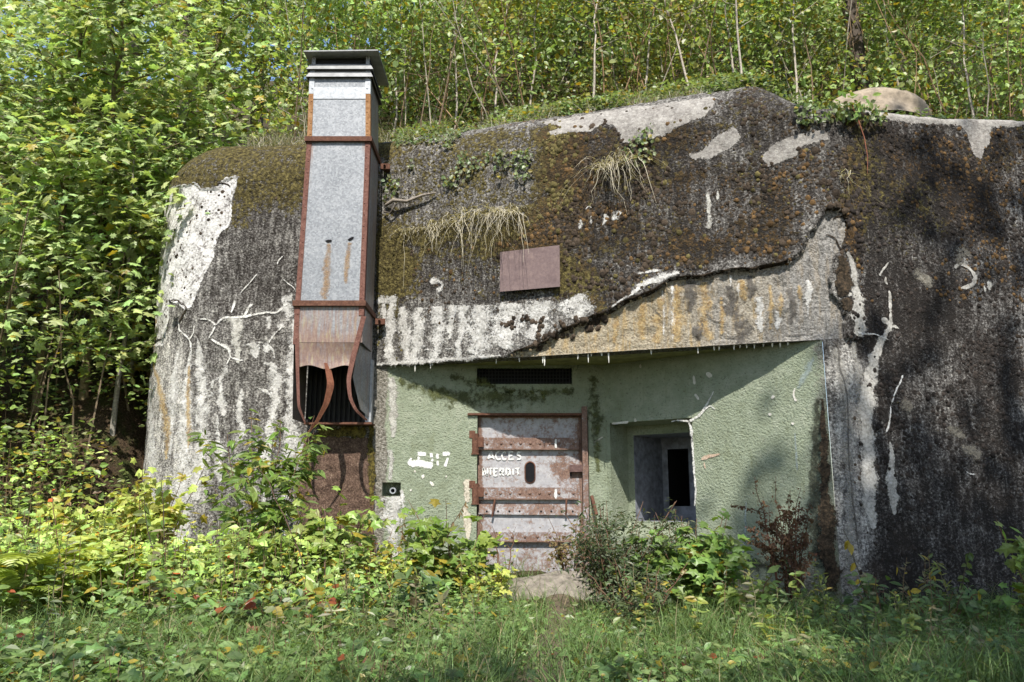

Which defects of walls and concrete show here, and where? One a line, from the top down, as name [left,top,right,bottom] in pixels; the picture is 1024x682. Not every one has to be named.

spalling [154,175,239,347]
crack [153,256,295,363]
crack [513,260,787,352]
damp [612,269,706,341]
damp [723,275,813,343]
crack [826,216,849,252]
damp [914,268,934,288]
damp [376,293,596,437]
damp [587,376,604,472]
crack [671,391,715,504]
damp [856,262,899,529]
damp [947,426,982,459]